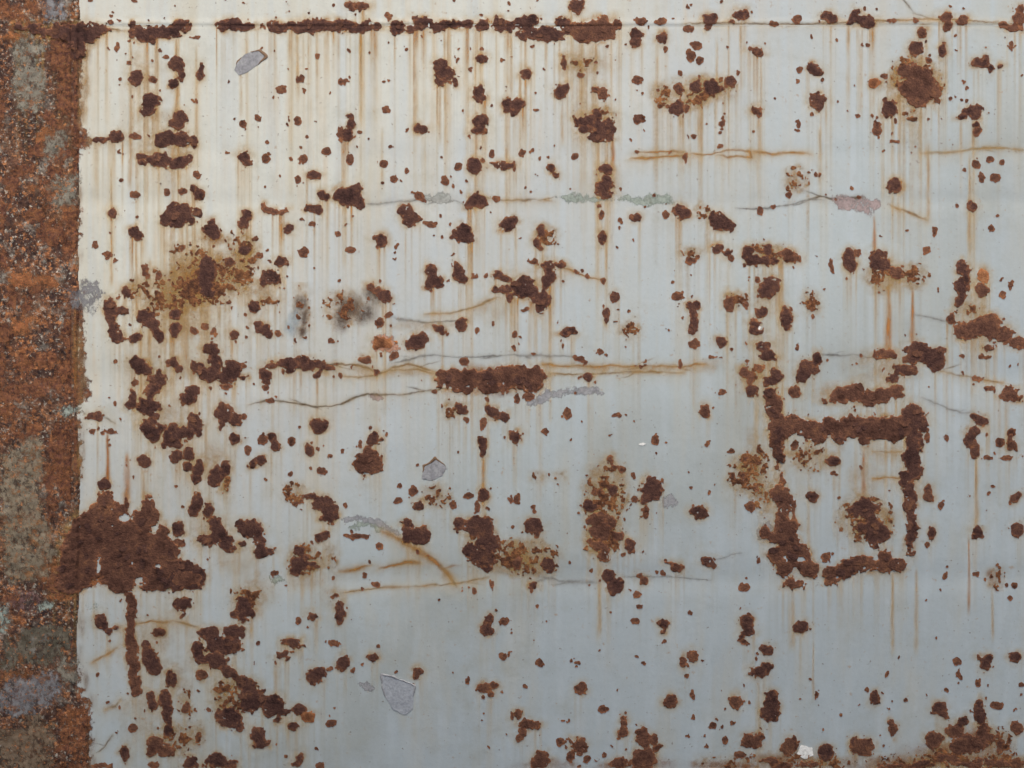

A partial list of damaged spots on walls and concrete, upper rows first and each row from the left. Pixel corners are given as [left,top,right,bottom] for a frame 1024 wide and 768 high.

peeling [235,49,268,75]
rust [214,0,753,249]
rust [397,67,640,348]
rust [794,5,989,152]
rust [0,0,495,768]
peeling [422,456,447,480]
rust [393,330,571,608]
rust [577,454,685,624]
rust [618,194,947,591]
rust [946,259,1024,359]
peeling [359,673,416,715]
rust [685,607,1024,768]